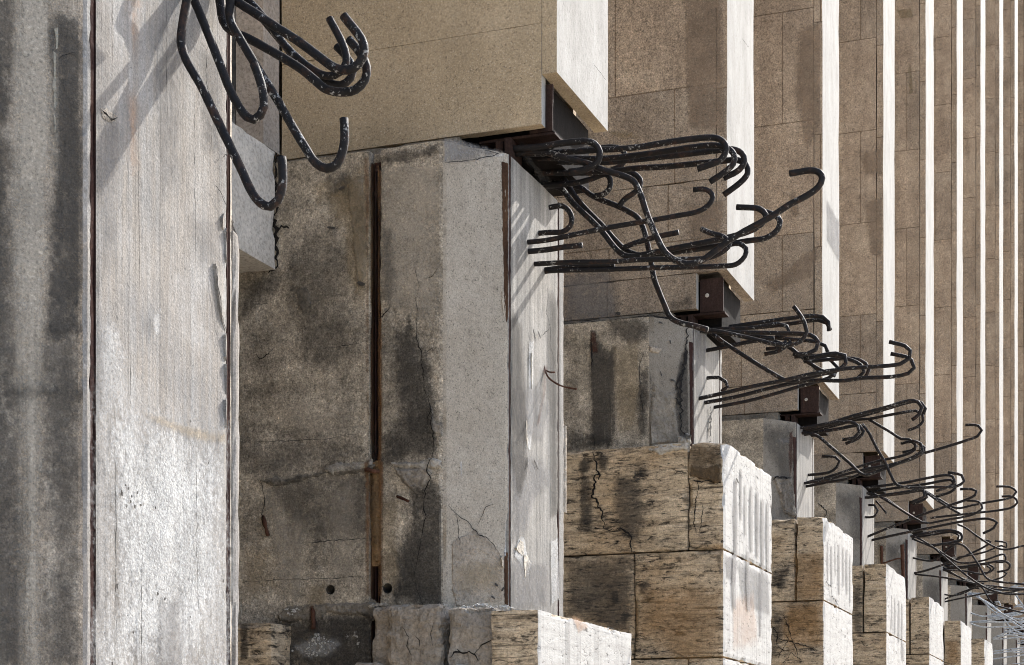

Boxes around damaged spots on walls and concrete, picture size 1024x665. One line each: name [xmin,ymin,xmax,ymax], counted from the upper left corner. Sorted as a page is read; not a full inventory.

crack [268,153,289,273]
water stain [0,0,83,665]
rust [365,327,383,595]
water stain [382,326,435,464]
water stain [394,481,441,605]
crack [414,268,504,603]
peeling [515,540,530,577]
crack [591,435,632,552]
water stain [617,468,646,540]
crack [675,328,712,443]
crack [688,478,721,532]
crack [403,626,491,660]